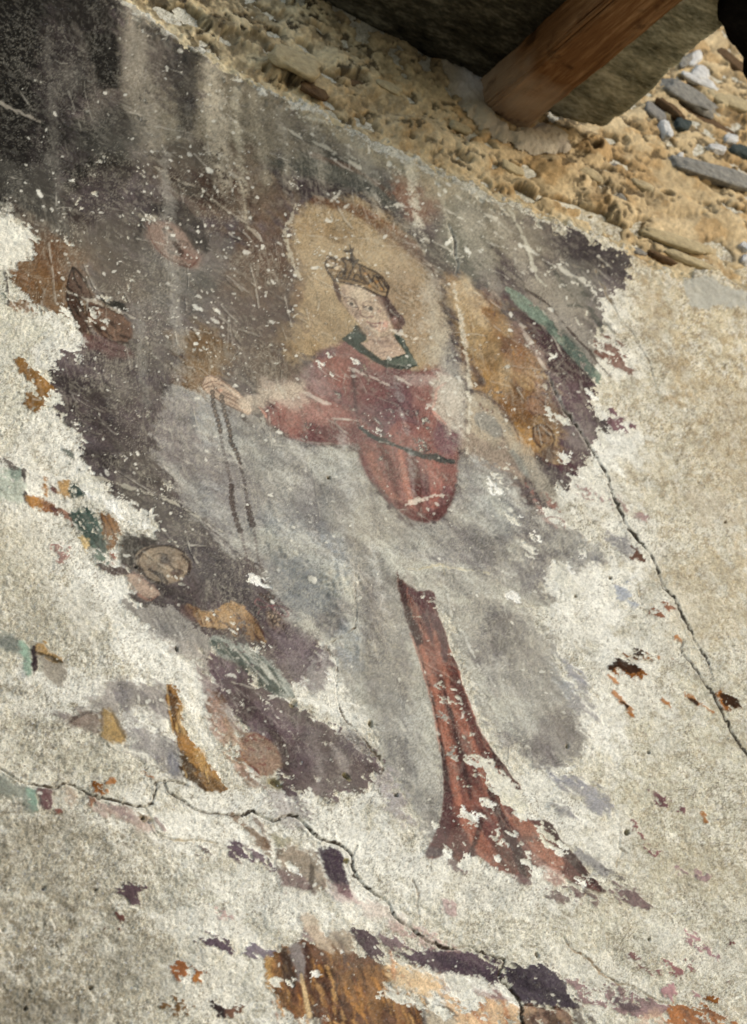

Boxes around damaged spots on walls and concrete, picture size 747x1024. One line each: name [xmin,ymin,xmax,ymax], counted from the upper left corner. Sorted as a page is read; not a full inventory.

peeling [36,360,208,590]
peeling [480,457,603,616]
crack [547,375,747,758]
peeling [647,601,675,619]
peeling [644,788,686,815]
peeling [103,880,148,932]
peeling [245,839,304,894]
crack [0,766,562,1024]
peeling [158,960,208,1018]
peeling [209,999,246,1020]
peeling [265,928,361,1022]
peeling [627,928,738,1019]